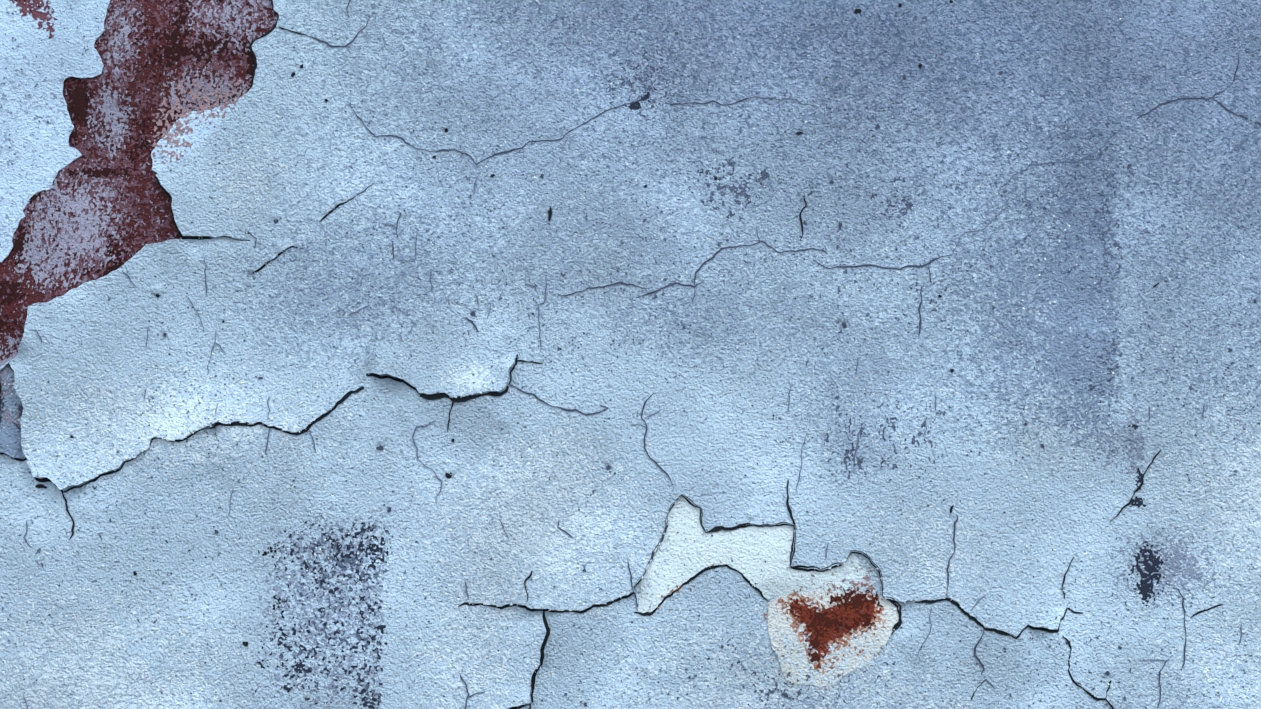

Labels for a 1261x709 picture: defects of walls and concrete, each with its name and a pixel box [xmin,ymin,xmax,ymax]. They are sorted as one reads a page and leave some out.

crack [249,0,371,88]
spalling [0,0,278,431]
crack [0,56,1261,540]
crack [458,382,1114,709]
rust [761,578,889,678]
crack [1140,589,1242,708]